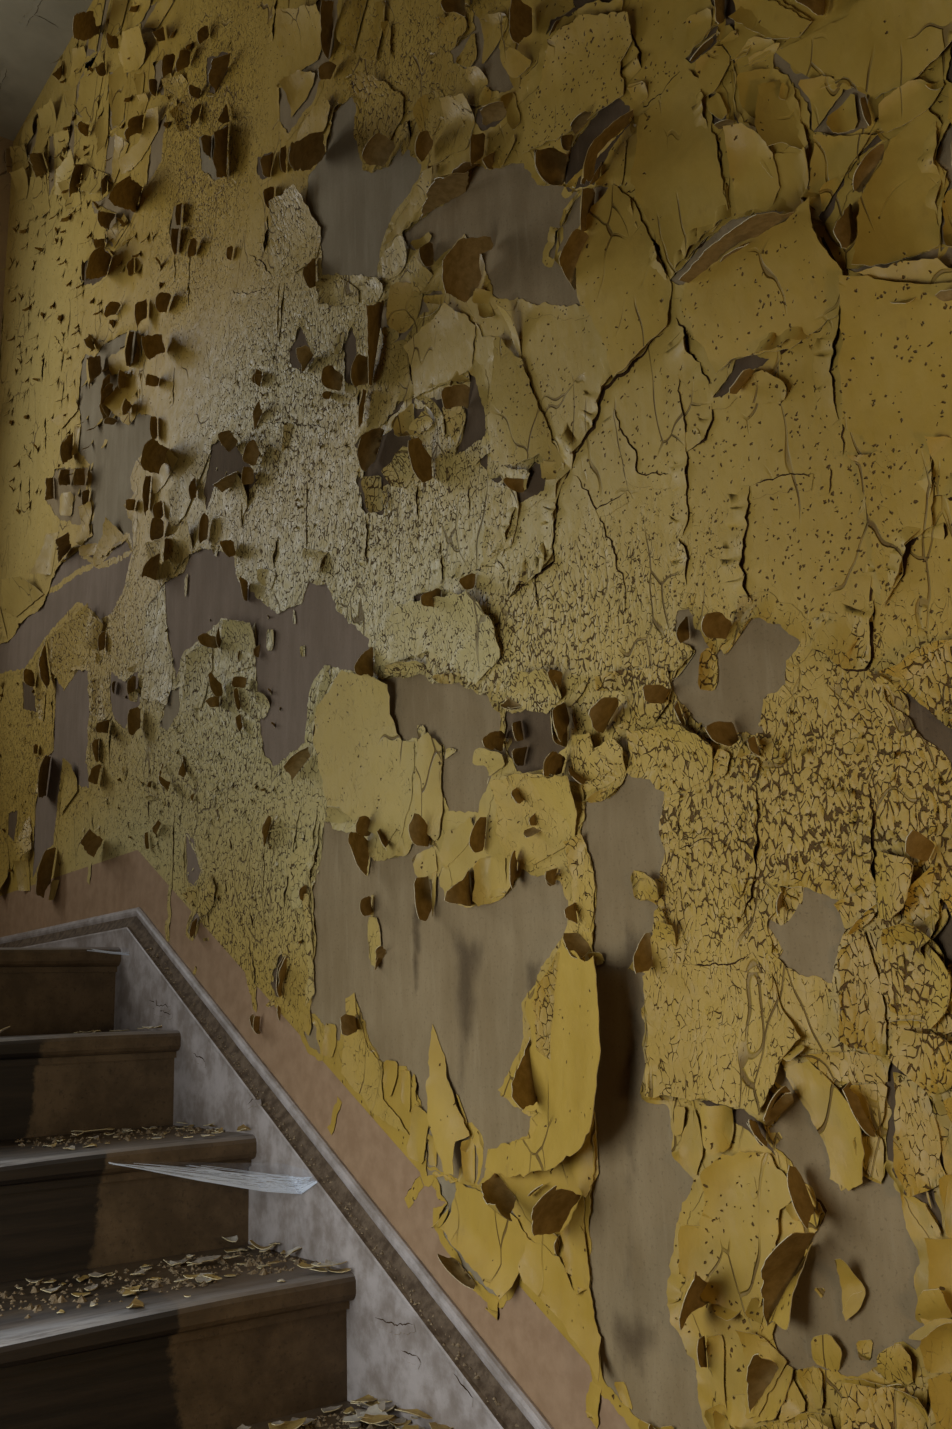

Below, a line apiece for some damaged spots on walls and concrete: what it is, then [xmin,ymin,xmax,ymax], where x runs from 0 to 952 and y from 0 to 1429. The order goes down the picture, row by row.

peeling [9,0,233,312]
crack [624,70,731,275]
peeling [89,298,121,330]
peeling [145,374,160,387]
peeling [285,316,318,378]
crack [499,275,952,622]
peeling [142,476,151,516]
peeling [231,676,247,744]
peeling [588,697,619,733]
peeling [81,817,104,885]
peeling [237,914,290,1034]
peeling [272,1394,453,1429]